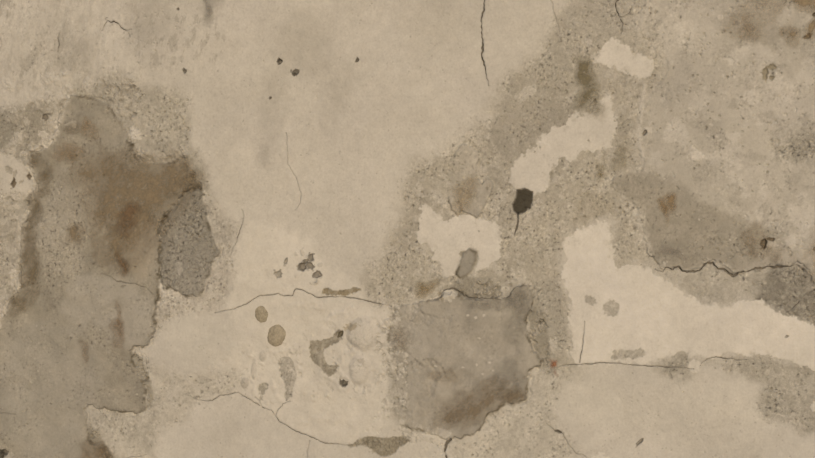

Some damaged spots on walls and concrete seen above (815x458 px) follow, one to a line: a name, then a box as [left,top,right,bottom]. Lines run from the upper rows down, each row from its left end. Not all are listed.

crack [479,0,490,86]
water stain [79,157,195,256]
peeling [322,0,815,458]
spalling [0,71,241,458]
crack [215,287,391,314]
crack [438,286,500,302]
crack [655,260,815,312]
crack [554,321,746,371]
crack [189,391,349,458]
crack [442,438,453,458]
crack [545,423,589,458]